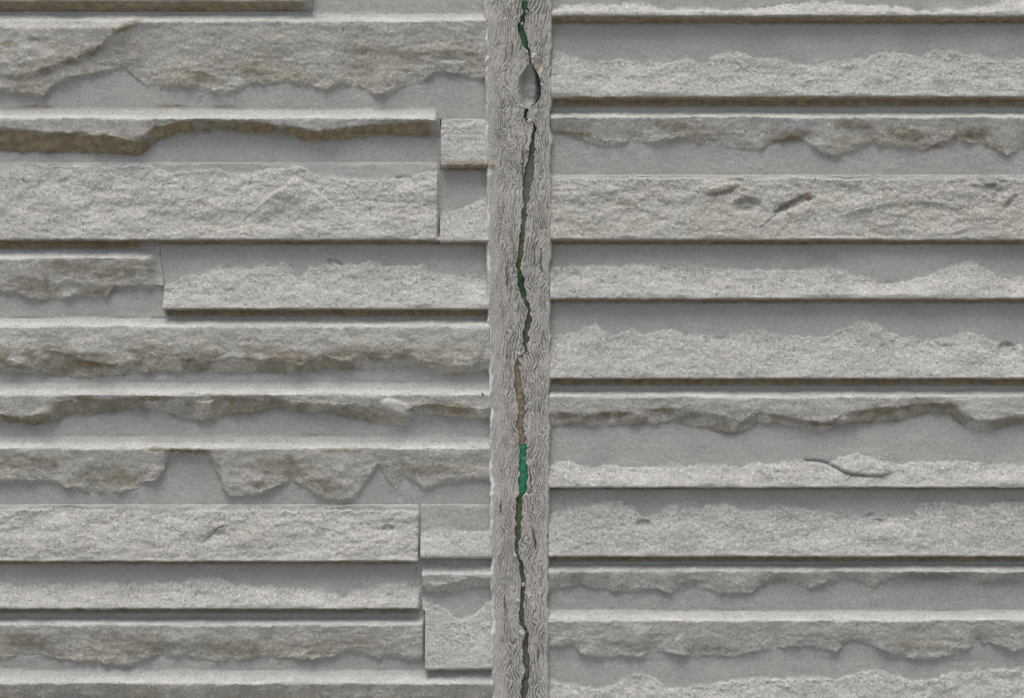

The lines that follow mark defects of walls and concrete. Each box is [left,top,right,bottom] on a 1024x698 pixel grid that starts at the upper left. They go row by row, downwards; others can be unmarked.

crack [511,0,536,63]
crack [499,104,542,698]